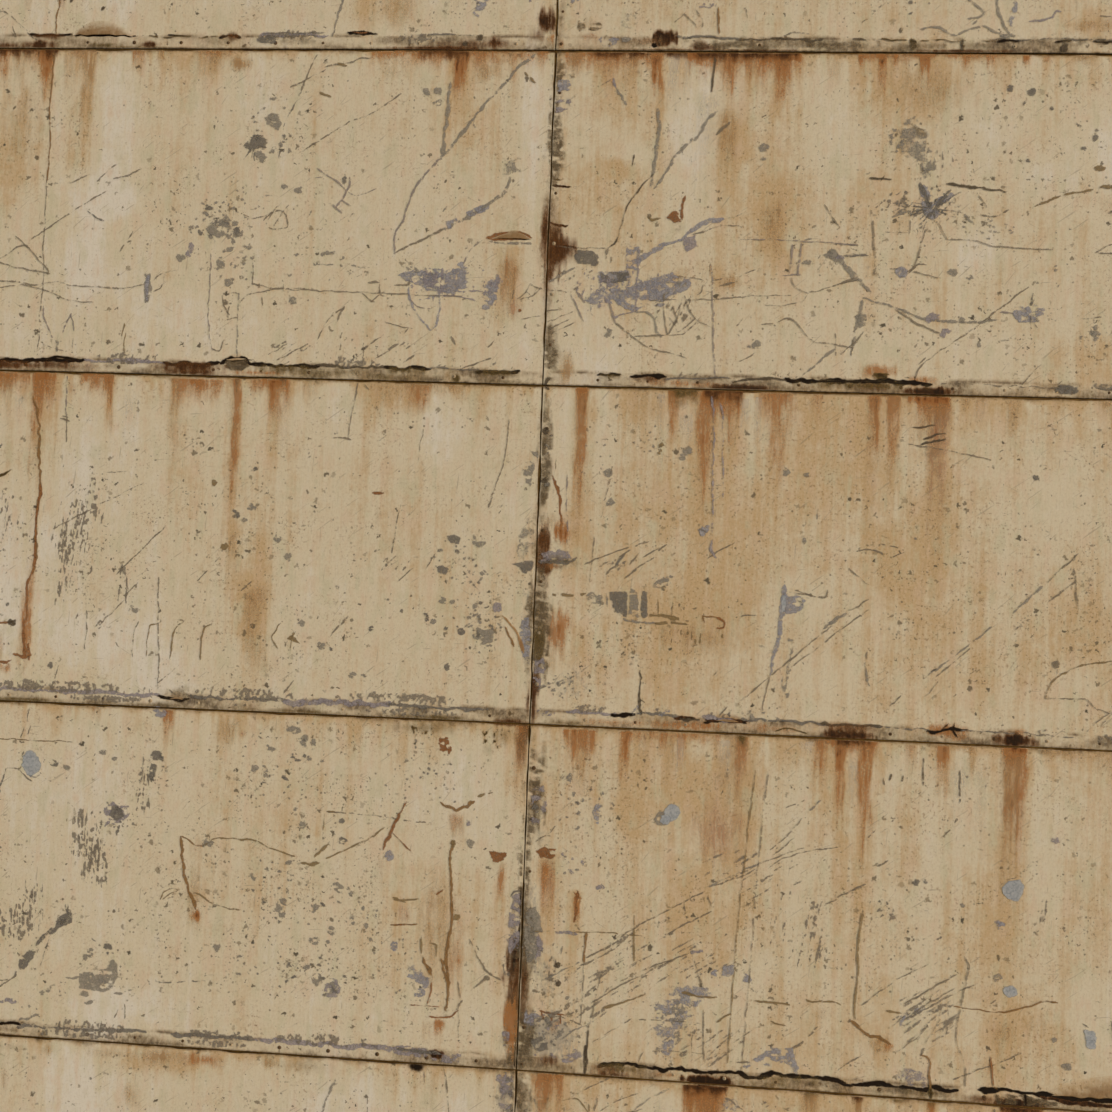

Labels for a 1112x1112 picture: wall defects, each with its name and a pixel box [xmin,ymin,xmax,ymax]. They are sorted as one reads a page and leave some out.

rust [487,213,577,281]
rust [668,382,788,485]
rust [489,411,569,1112]
rust [817,726,878,848]
rust [669,1074,731,1112]
rust [974,1096,1045,1112]